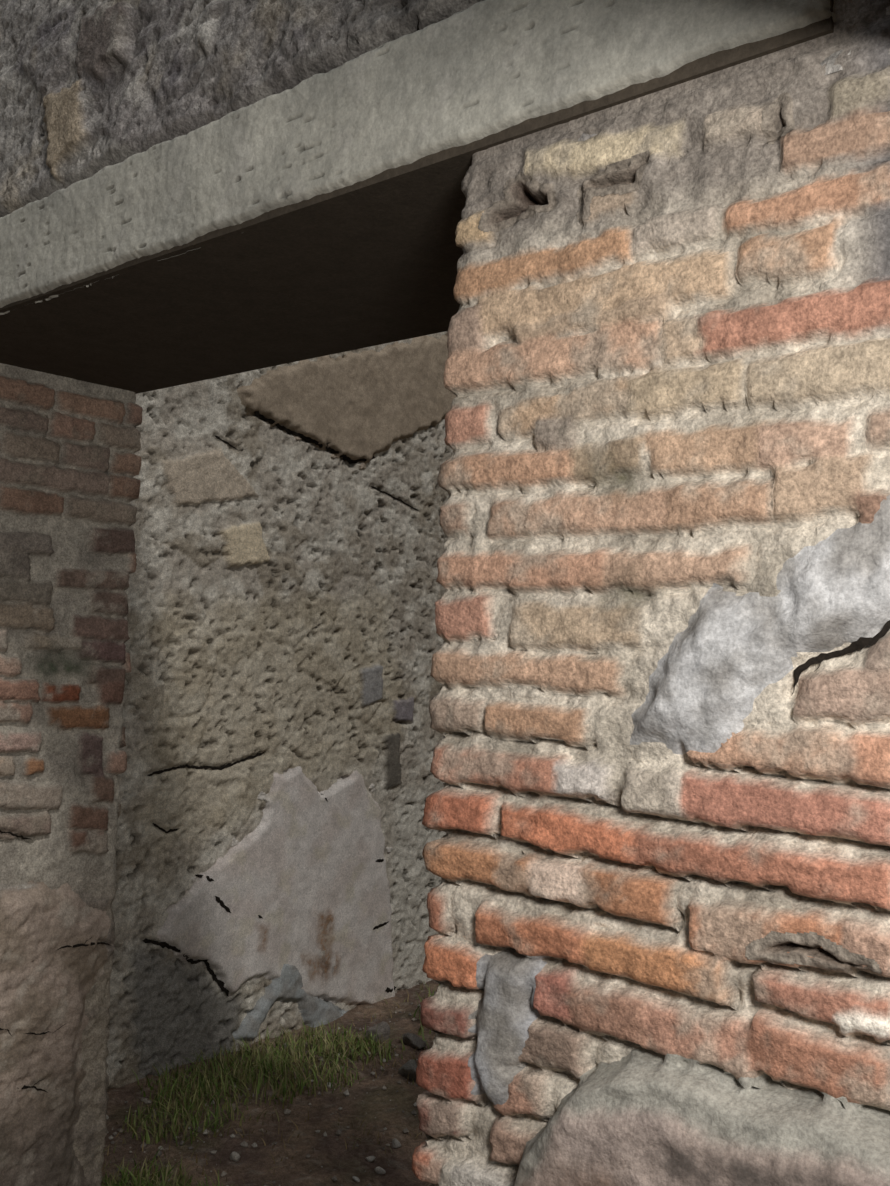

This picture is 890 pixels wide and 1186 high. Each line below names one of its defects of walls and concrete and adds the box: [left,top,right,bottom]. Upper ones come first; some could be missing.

crack [791,620,890,696]
crack [147,751,266,776]
crack [57,937,112,950]
crack [142,938,230,997]